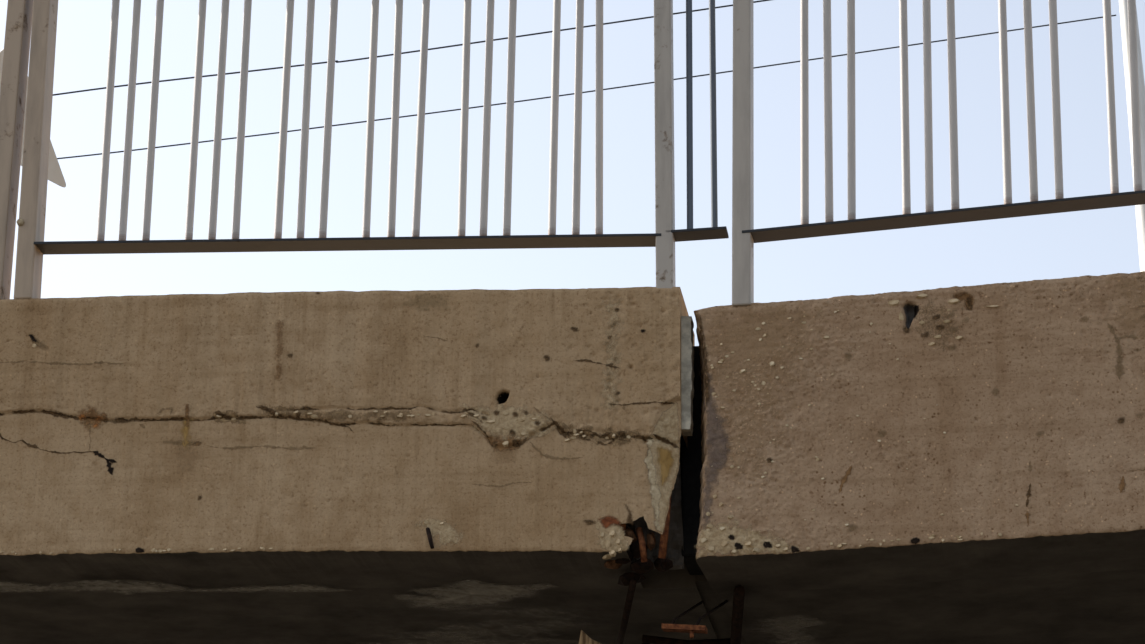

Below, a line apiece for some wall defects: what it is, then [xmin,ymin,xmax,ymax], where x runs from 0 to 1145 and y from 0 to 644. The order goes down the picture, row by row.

spalling [916,293,999,349]
crack [576,359,618,368]
crack [0,401,675,460]
spalling [460,403,679,644]
spalling [642,585,745,644]